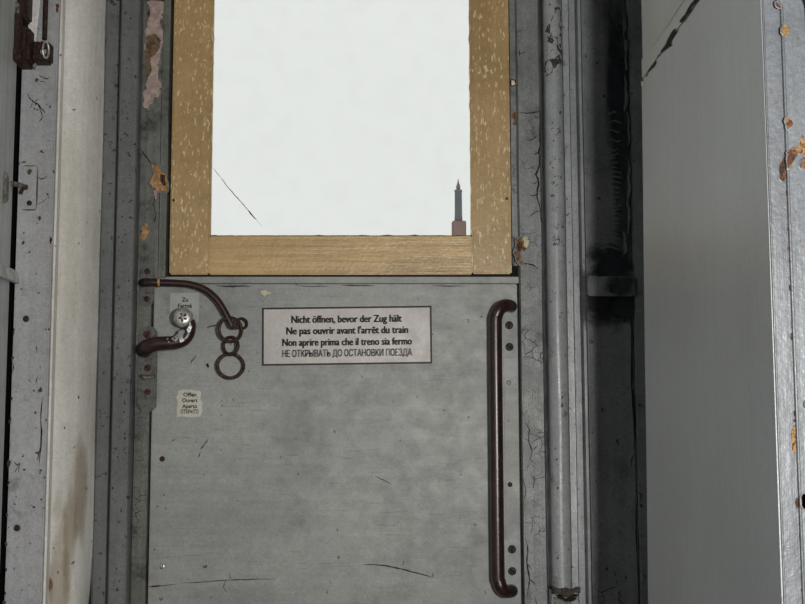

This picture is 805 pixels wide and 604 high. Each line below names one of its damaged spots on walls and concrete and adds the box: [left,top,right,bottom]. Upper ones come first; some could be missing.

peeling [142,0,164,111]
peeling [149,163,169,199]
crack [518,111,564,245]
water stain [580,3,635,325]
corrosion [777,133,805,204]